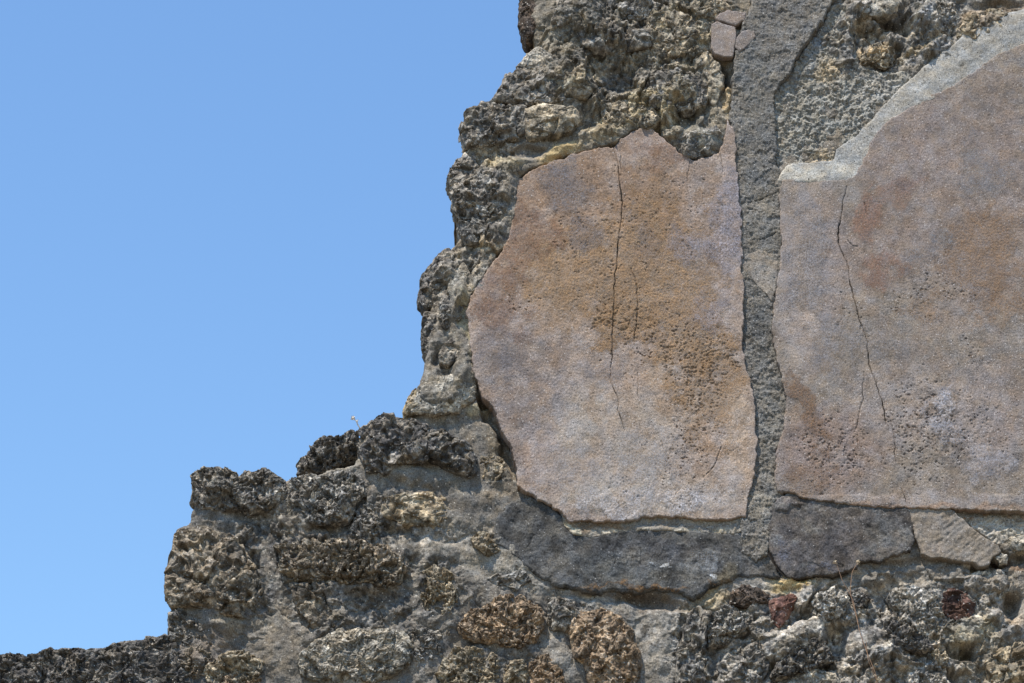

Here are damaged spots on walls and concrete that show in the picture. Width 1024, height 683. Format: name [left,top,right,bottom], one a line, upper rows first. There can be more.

crack [610,152,639,424]